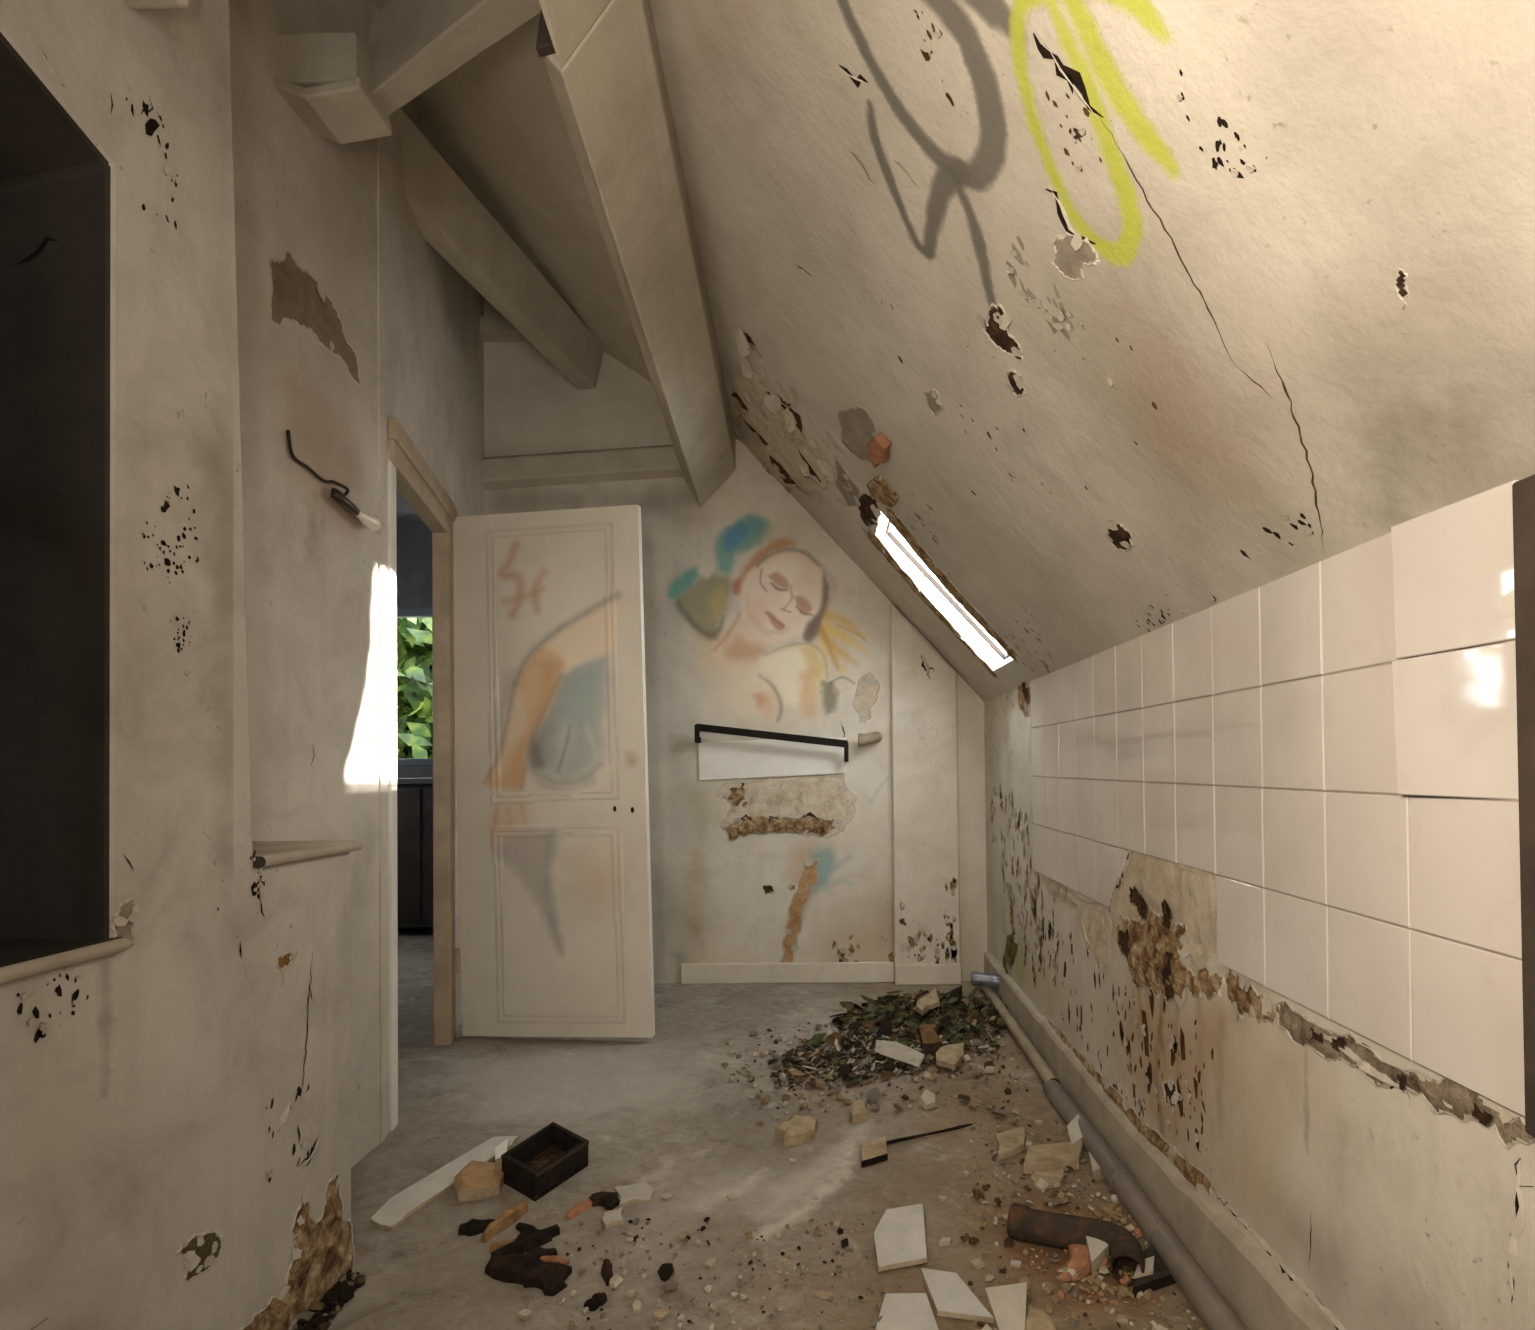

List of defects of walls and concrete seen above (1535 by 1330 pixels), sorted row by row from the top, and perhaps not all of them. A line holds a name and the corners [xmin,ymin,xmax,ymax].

spalling [269,251,361,385]
spalling [976,302,1027,398]
crack [1033,29,1324,548]
spalling [717,327,1535,1201]
spalling [176,1229,223,1283]
spalling [239,1171,356,1330]